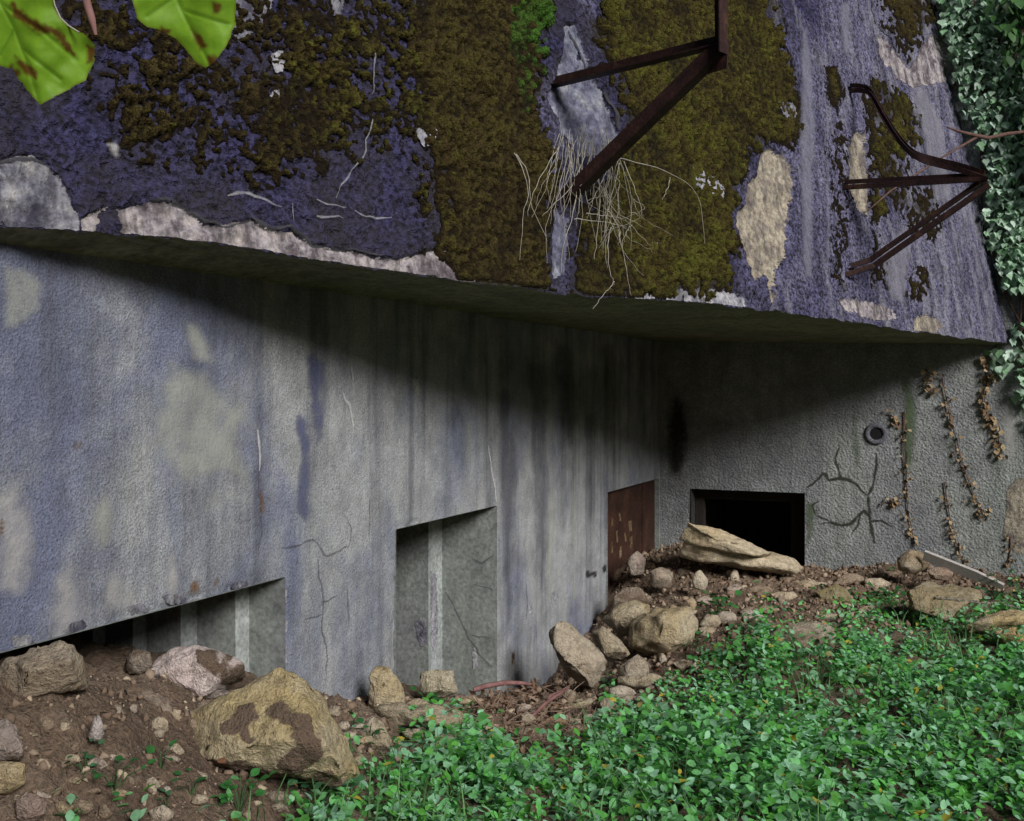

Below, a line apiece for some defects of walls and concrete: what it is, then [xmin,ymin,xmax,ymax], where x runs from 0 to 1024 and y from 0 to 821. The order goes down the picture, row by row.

spalling [547,25,618,157]
spalling [876,35,949,88]
spalling [0,155,475,282]
spalling [551,210,570,278]
spalling [736,149,794,303]
spalling [848,132,870,217]
damp [668,398,687,472]
crack [807,447,891,544]